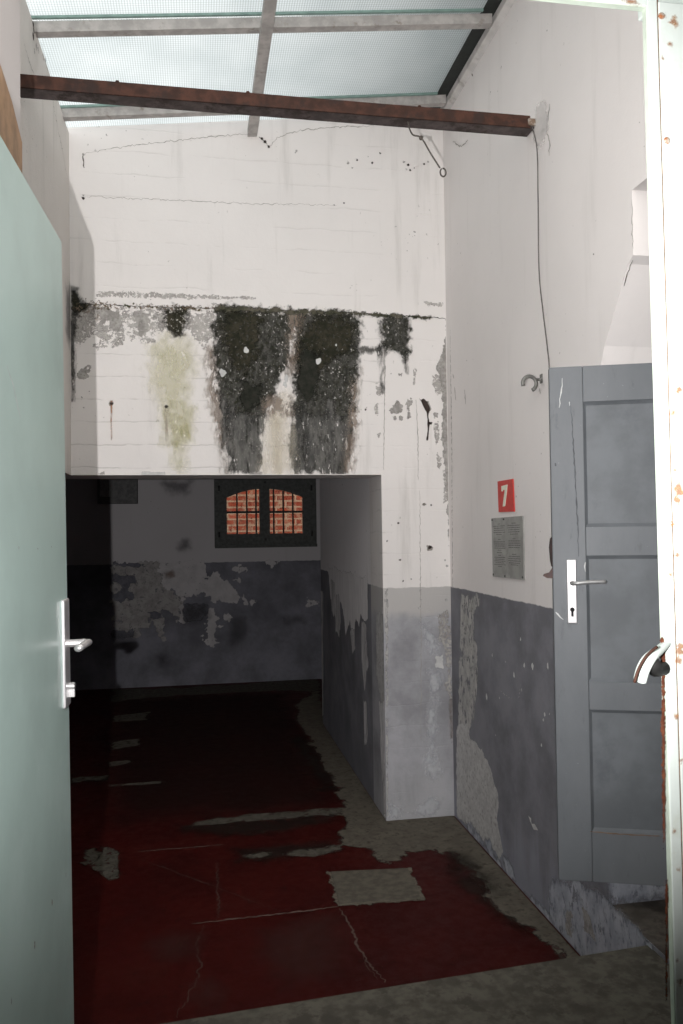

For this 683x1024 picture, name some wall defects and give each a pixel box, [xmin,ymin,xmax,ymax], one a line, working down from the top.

crack [52,100,368,206]
leakage [206,304,412,474]
corrosion [659,637,683,663]
peeling [71,739,162,787]
peeling [109,559,666,959]
corrosion [660,675,678,849]
peeling [80,847,120,880]
corrosion [665,880,682,1000]